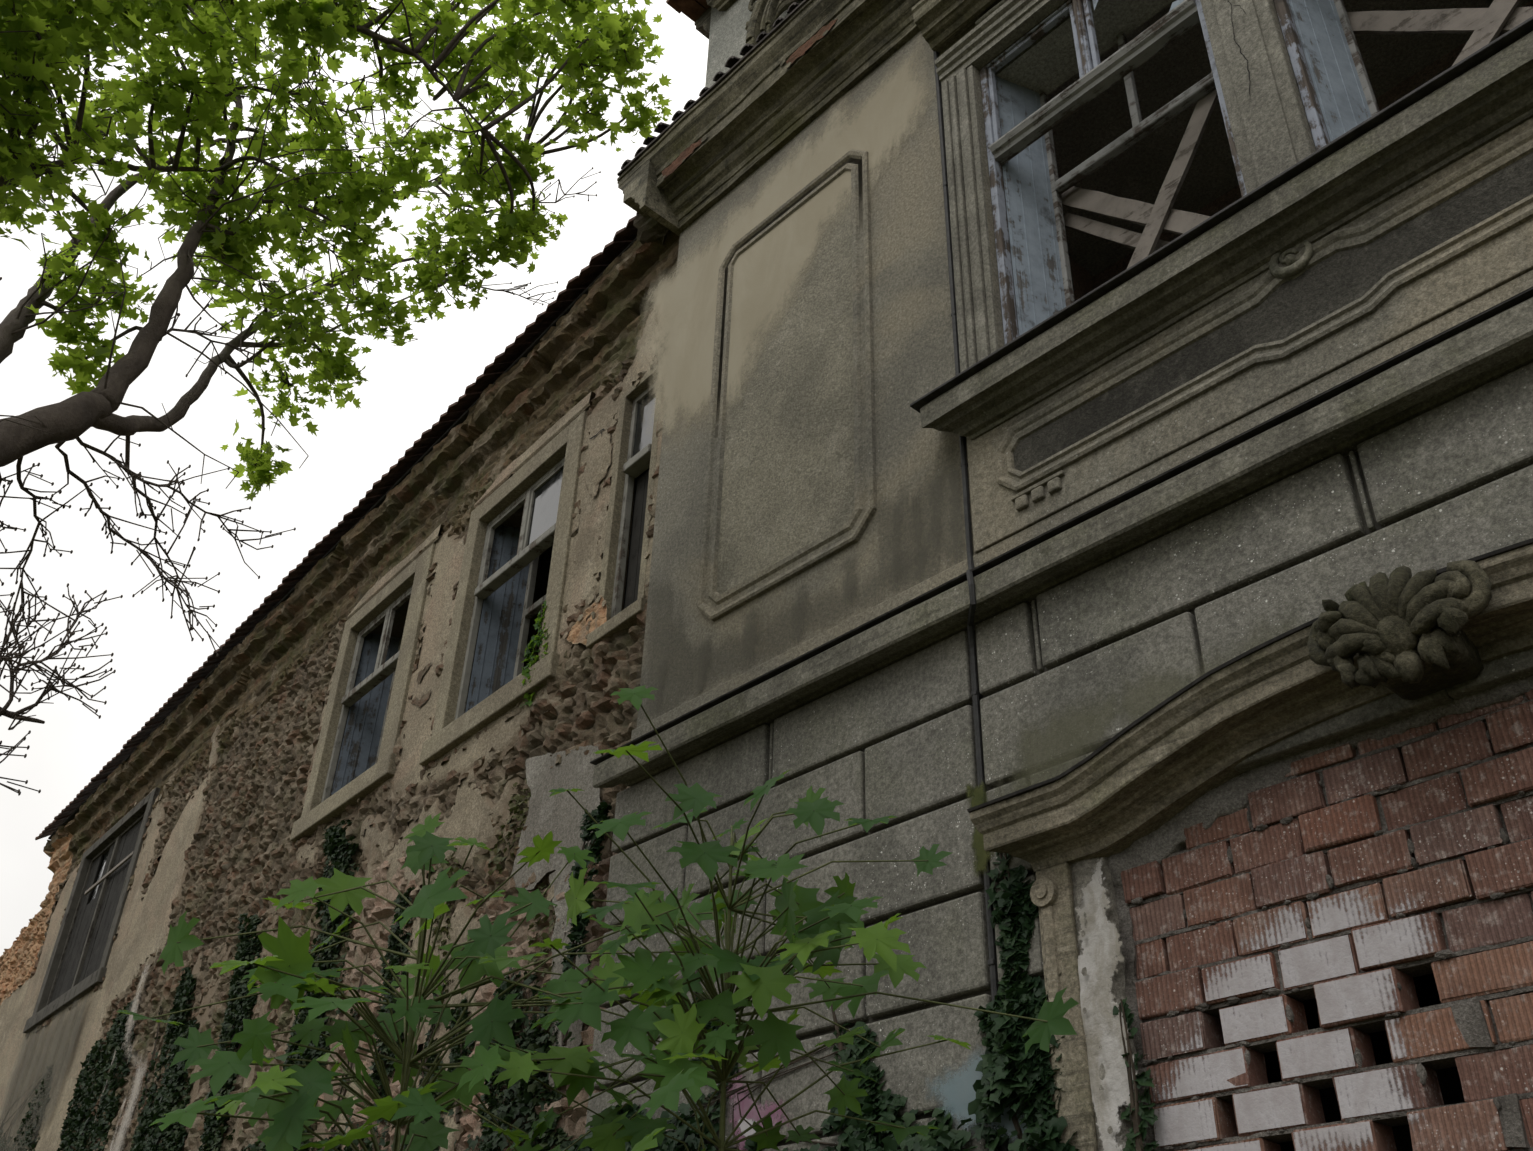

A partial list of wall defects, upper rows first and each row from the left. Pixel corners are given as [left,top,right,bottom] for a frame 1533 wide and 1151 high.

flaking render [0,231,680,1151]